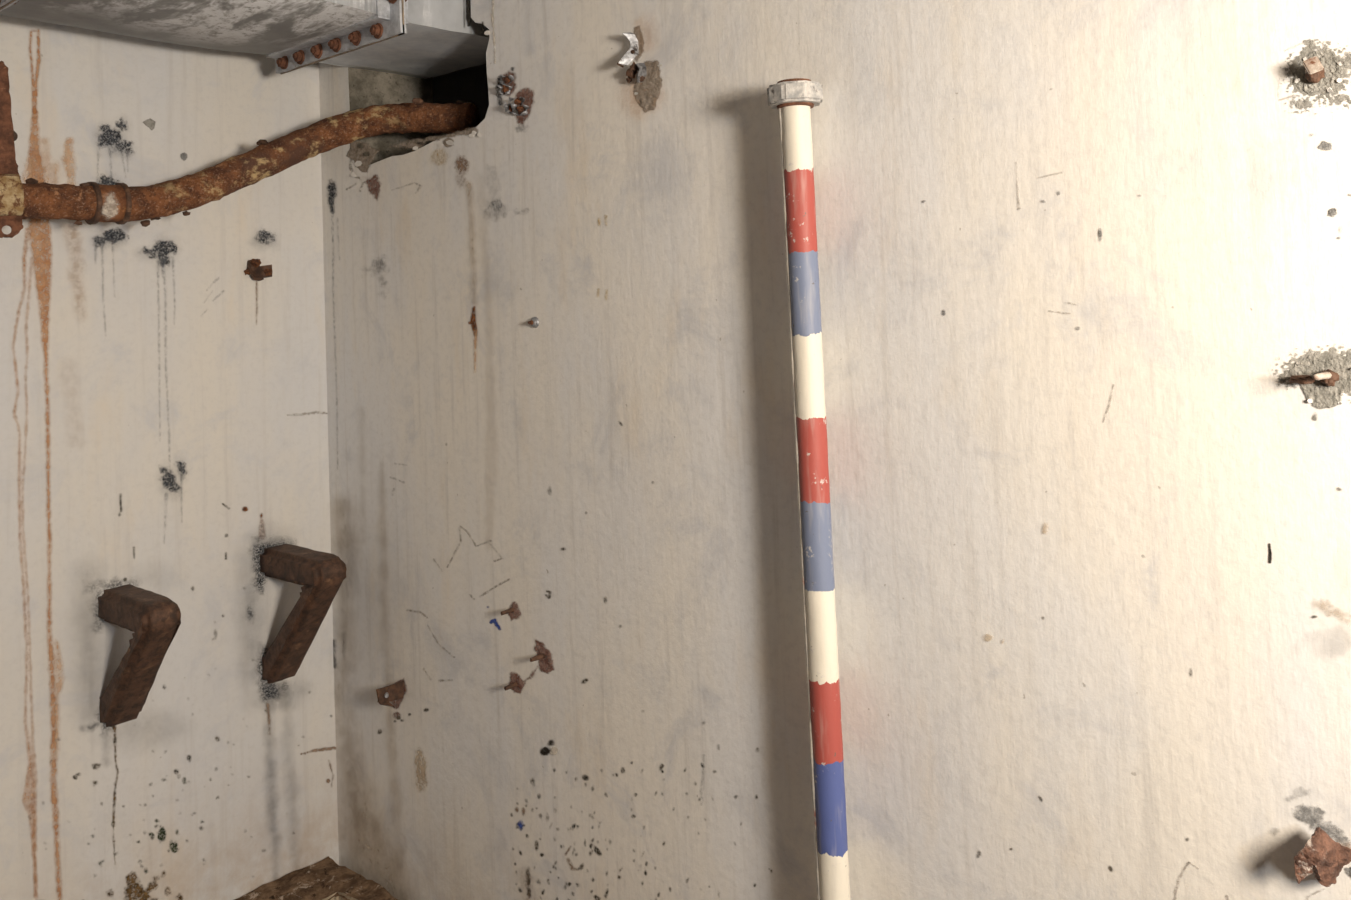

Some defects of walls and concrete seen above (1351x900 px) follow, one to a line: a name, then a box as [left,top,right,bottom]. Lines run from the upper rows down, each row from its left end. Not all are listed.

rust [25,30,44,185]
spalling [1280,39,1351,114]
rust [64,139,91,186]
spalling [346,128,484,199]
spalling [1275,345,1351,421]
rust [23,218,61,900]
spalling [1295,806,1350,848]